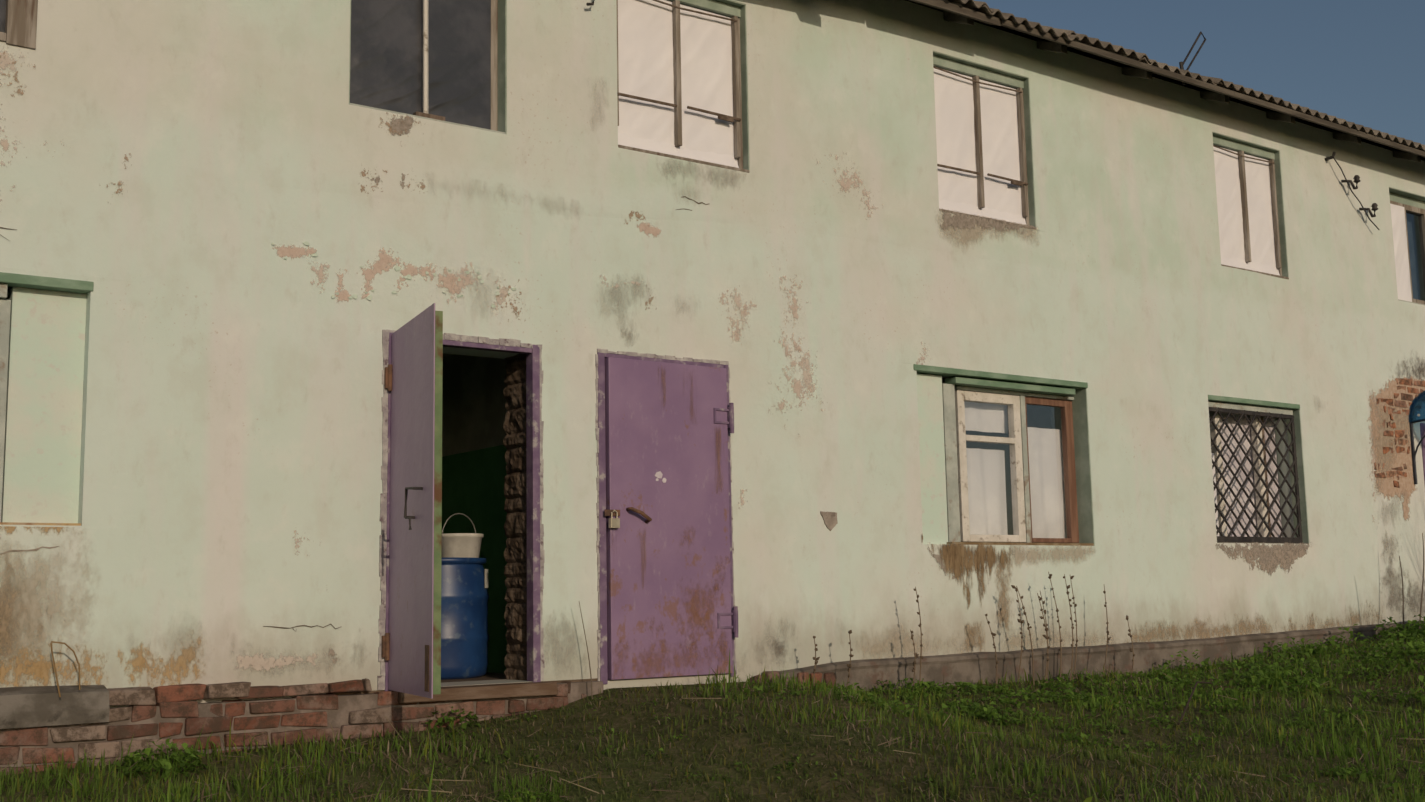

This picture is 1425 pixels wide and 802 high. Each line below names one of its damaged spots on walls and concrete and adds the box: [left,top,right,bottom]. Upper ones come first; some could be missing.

peeling [0,51,35,105]
flaking render [625,211,661,237]
peeling [271,241,522,322]
peeling [776,276,822,410]
flaking render [1368,376,1425,520]
crack [263,623,342,631]